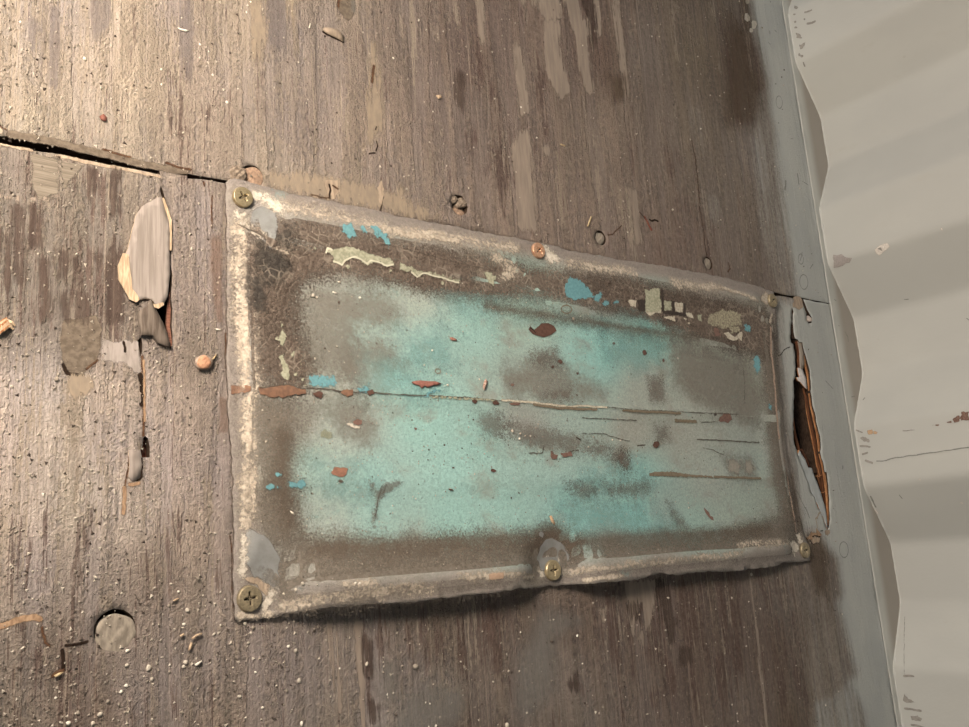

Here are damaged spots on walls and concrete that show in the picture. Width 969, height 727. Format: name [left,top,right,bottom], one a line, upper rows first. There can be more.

peeling [314,246,460,285]
peeling [529,323,557,337]
peeling [628,288,743,341]
peeling [231,321,323,399]
rust [234,214,801,606]
peeling [529,447,579,459]
peeling [331,467,348,483]